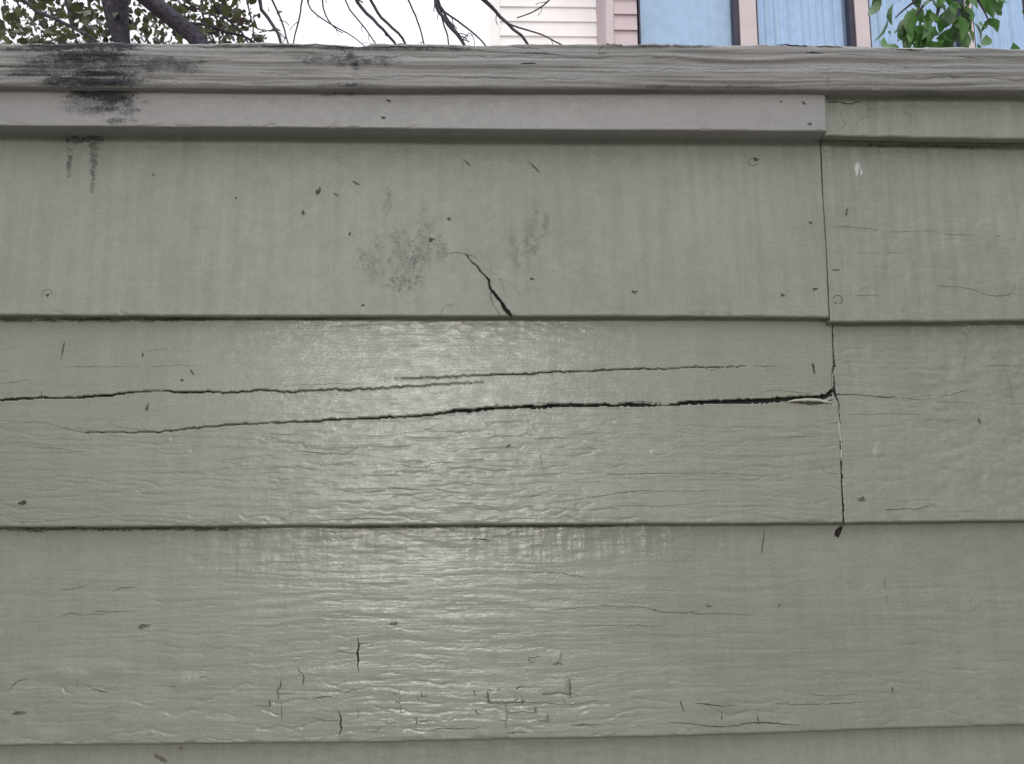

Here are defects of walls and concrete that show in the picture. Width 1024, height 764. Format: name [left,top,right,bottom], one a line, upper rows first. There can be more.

leakage [3,40,202,123]
crack [0,152,1019,524]